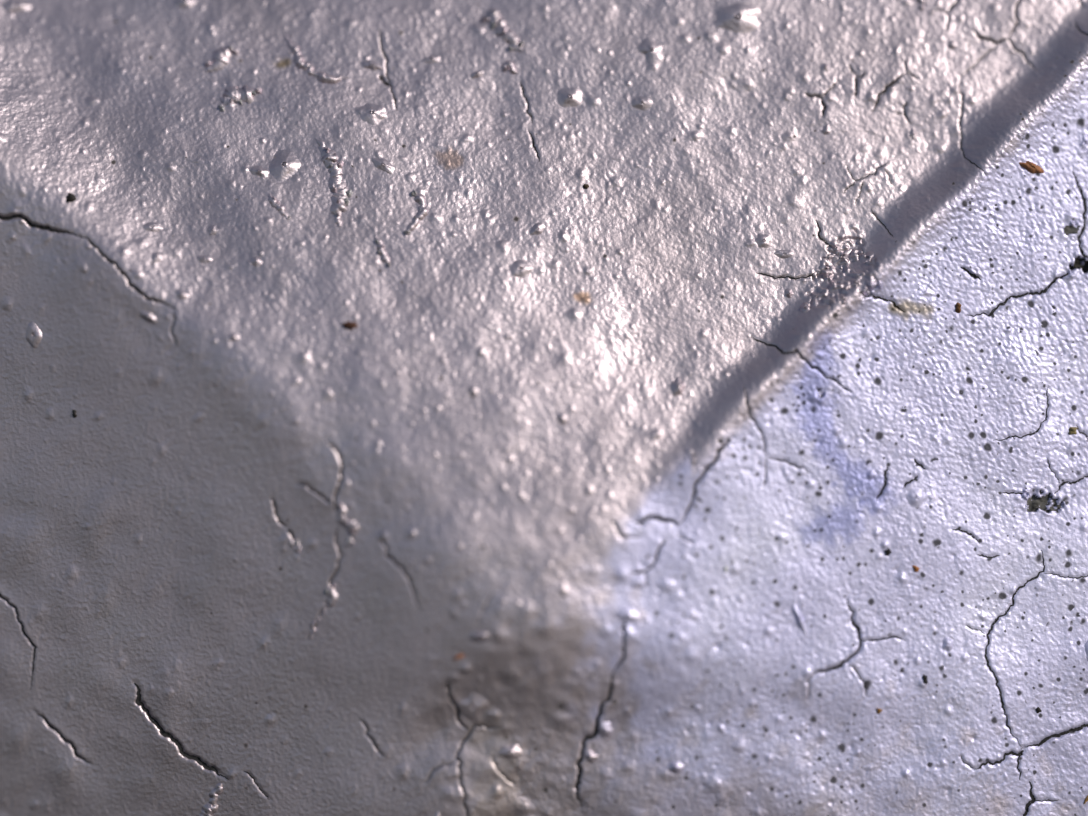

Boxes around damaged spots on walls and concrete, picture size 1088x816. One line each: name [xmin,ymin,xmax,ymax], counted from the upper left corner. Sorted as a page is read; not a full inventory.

crack [931,0,1036,173]
crack [0,214,176,344]
crack [967,171,1088,317]
crack [610,385,809,587]
crack [953,528,1000,558]
crack [995,389,1049,441]
spalling [1021,488,1065,513]
crack [1047,457,1088,493]
crack [134,683,269,798]
crack [575,622,626,807]
crack [808,601,906,700]
crack [959,550,1088,816]